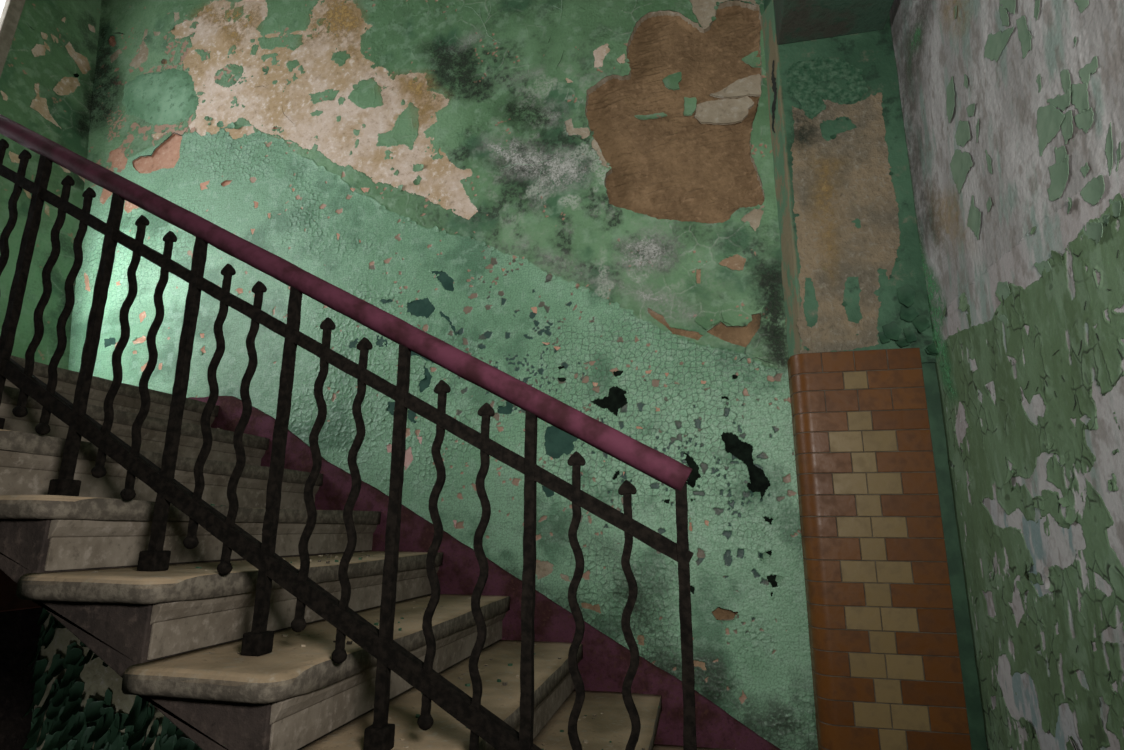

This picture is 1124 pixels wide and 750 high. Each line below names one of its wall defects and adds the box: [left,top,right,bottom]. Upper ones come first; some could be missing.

peeling [984,0,1040,62]
peeling [108,0,478,220]
spalling [565,0,765,231]
peeling [790,56,1124,355]
peeling [590,369,630,416]
peeling [681,452,704,501]
peeling [715,429,770,502]
peeling [760,551,784,596]
peeling [980,387,1086,628]
peeling [1071,376,1124,567]
peeling [23,608,202,750]
peeling [990,654,1083,750]